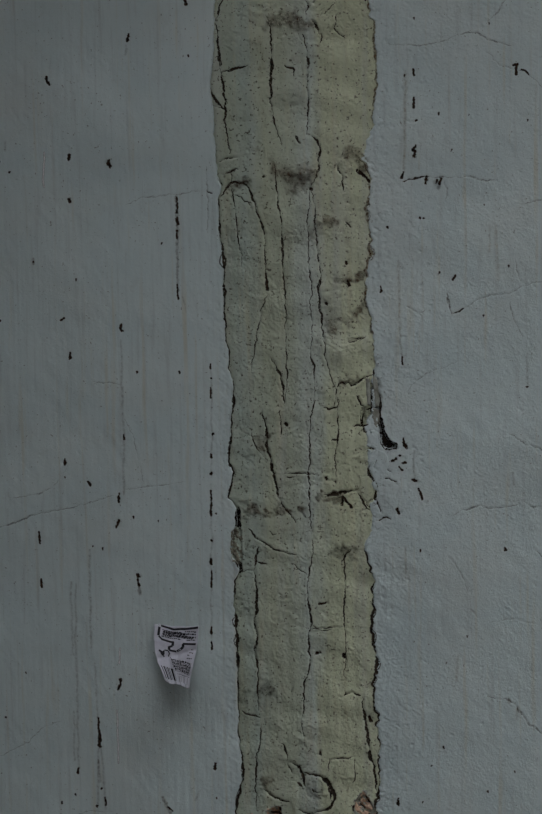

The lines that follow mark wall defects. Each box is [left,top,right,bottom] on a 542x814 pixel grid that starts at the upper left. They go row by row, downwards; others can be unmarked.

crack [207,0,397,814]
peeling [365,376,398,450]
spalling [230,508,243,573]
spalling [265,806,282,814]
spalling [352,790,377,814]